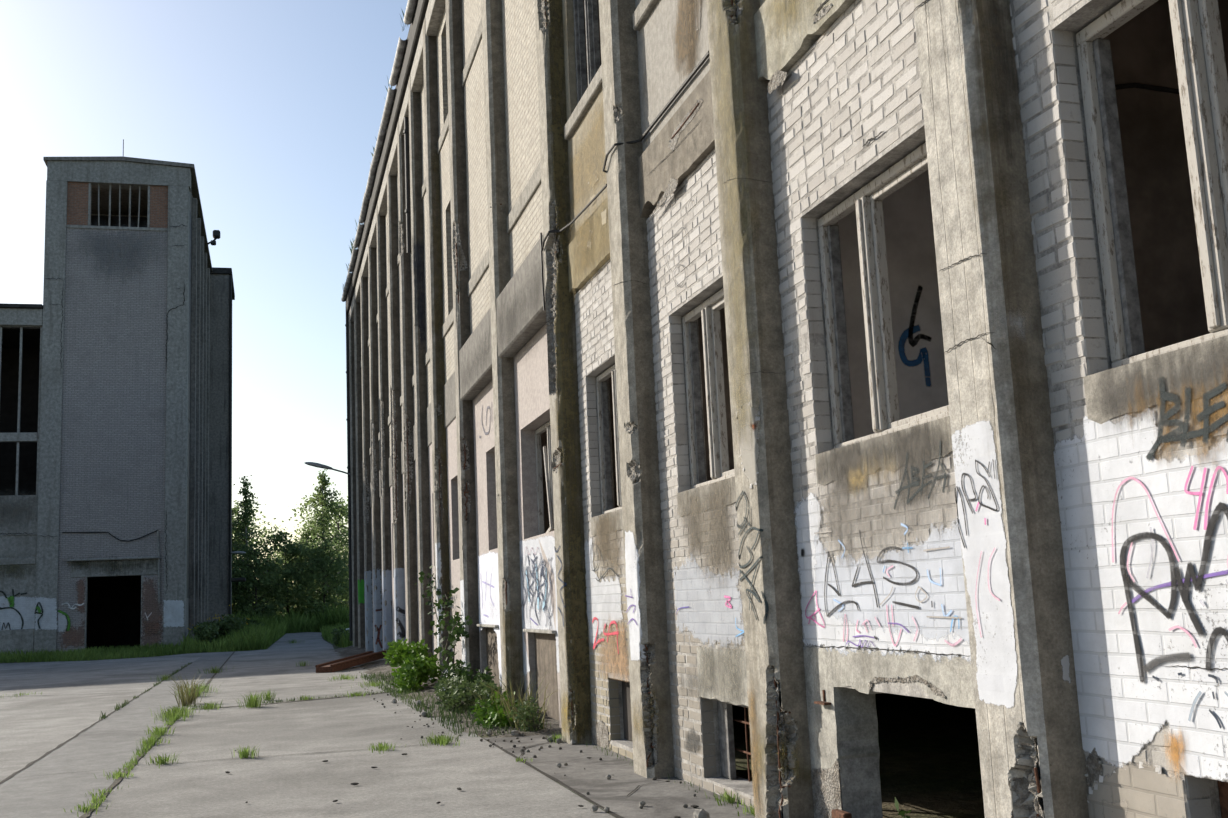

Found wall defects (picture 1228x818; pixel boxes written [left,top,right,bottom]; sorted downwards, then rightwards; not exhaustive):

water stain [675,0,701,74]
crack [914,0,949,105]
crack [165,279,185,373]
water stain [683,486,730,569]
spalling [640,643,659,769]
spalling [765,666,798,818]
spalling [812,758,844,818]
spalling [1008,722,1045,818]